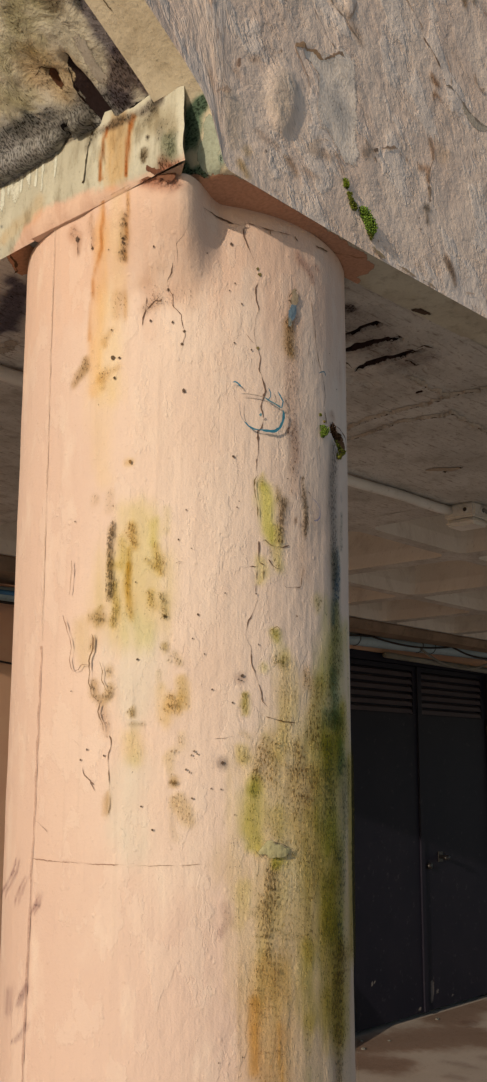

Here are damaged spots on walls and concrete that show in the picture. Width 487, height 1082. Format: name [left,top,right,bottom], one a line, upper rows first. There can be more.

leakage [0,52,162,210]
peeling [295,41,361,166]
crack [314,0,365,50]
crack [319,138,435,230]
crack [407,0,487,142]
crack [206,209,436,470]
leakage [279,317,310,542]
leakage [88,521,135,624]
crack [246,541,303,726]